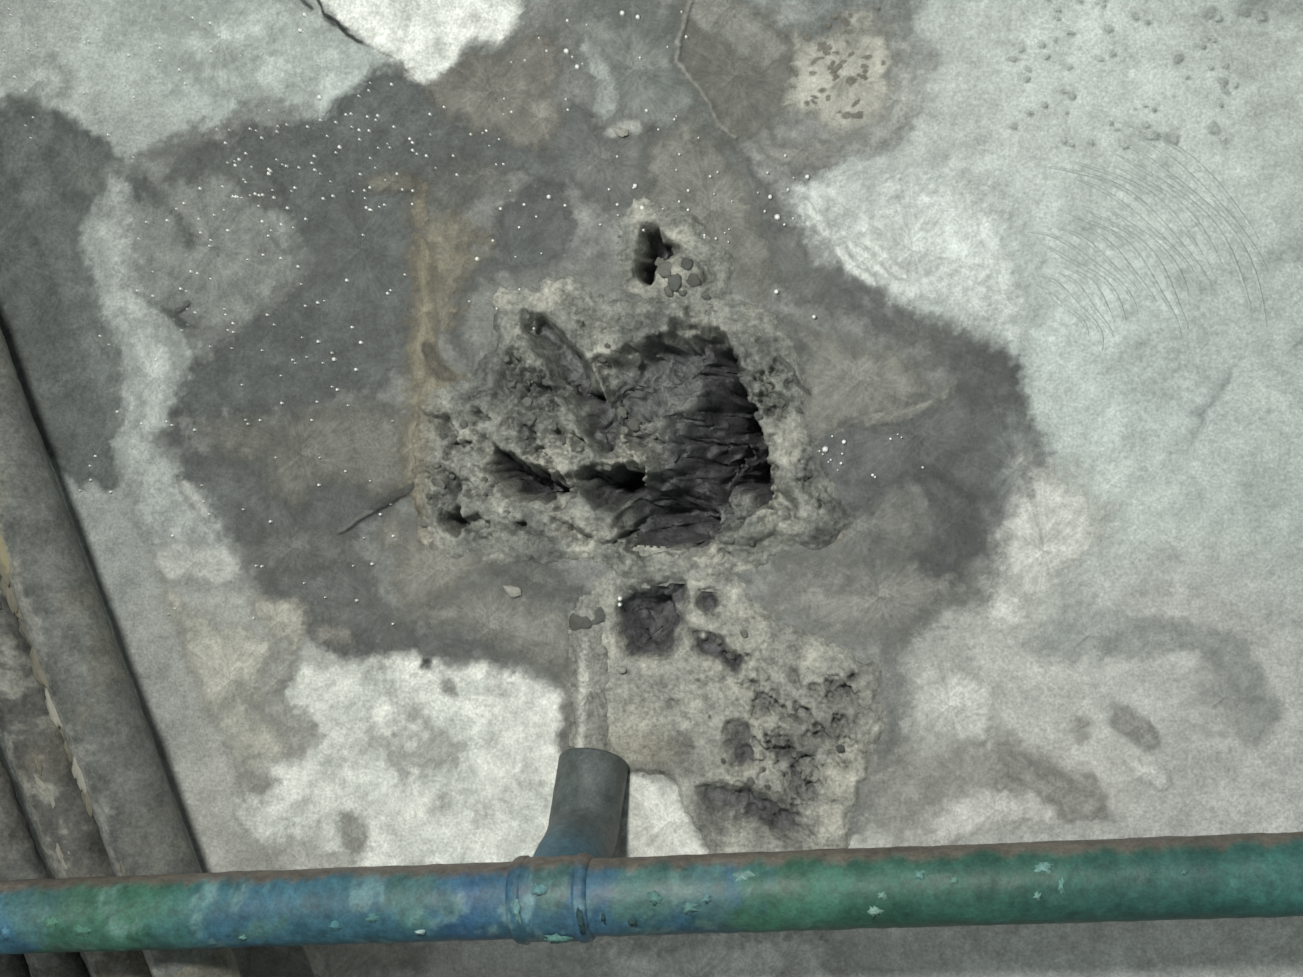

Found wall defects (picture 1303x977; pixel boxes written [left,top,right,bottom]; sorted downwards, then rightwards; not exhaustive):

crack [301,0,363,43]
damp [0,0,1107,846]
spalling [407,275,887,857]
damp [1110,705,1171,790]
peeling [733,870,756,882]